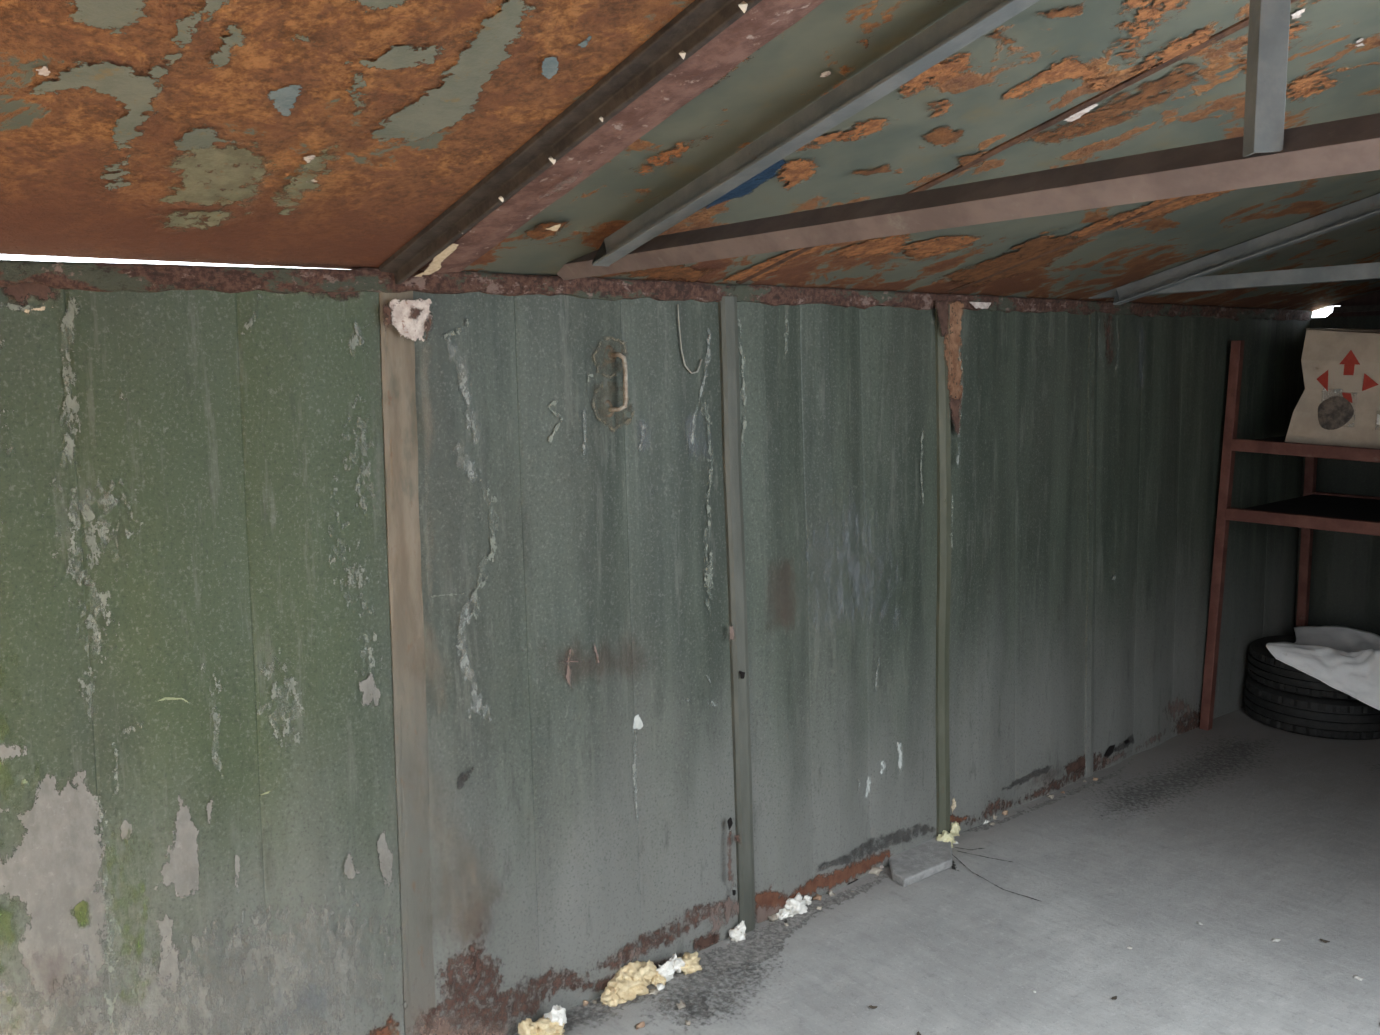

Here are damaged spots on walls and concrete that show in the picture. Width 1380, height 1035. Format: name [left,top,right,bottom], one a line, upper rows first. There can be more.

damp [0,301,40,311]
damp [58,297,82,469]
peeling [29,0,246,190]
peeling [158,124,339,232]
peeling [414,243,459,277]
peeling [344,0,536,143]
rust [936,189,1237,434]
rust [1003,0,1224,145]
efflorescence [431,363,499,721]
rust [950,753,1107,826]
peeling [0,722,407,1035]
rust [370,824,934,1035]